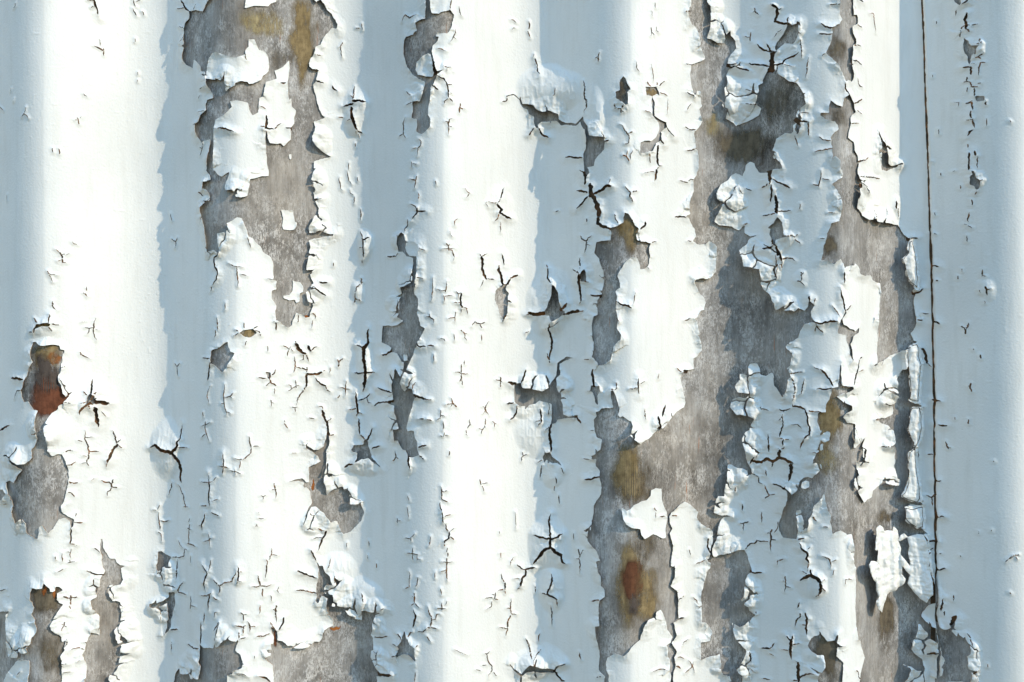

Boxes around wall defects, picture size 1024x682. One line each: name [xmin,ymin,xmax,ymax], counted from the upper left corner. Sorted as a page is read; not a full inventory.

corrosion [32,345,72,416]
peeling [0,316,105,546]
peeling [0,536,140,682]
crack [78,319,122,496]
peeling [177,0,343,332]
peeling [171,423,420,682]
crack [245,321,398,461]
crack [526,124,658,363]
corrosion [616,544,644,626]
peeling [502,0,989,682]
crack [734,367,852,682]
crack [918,0,1011,654]